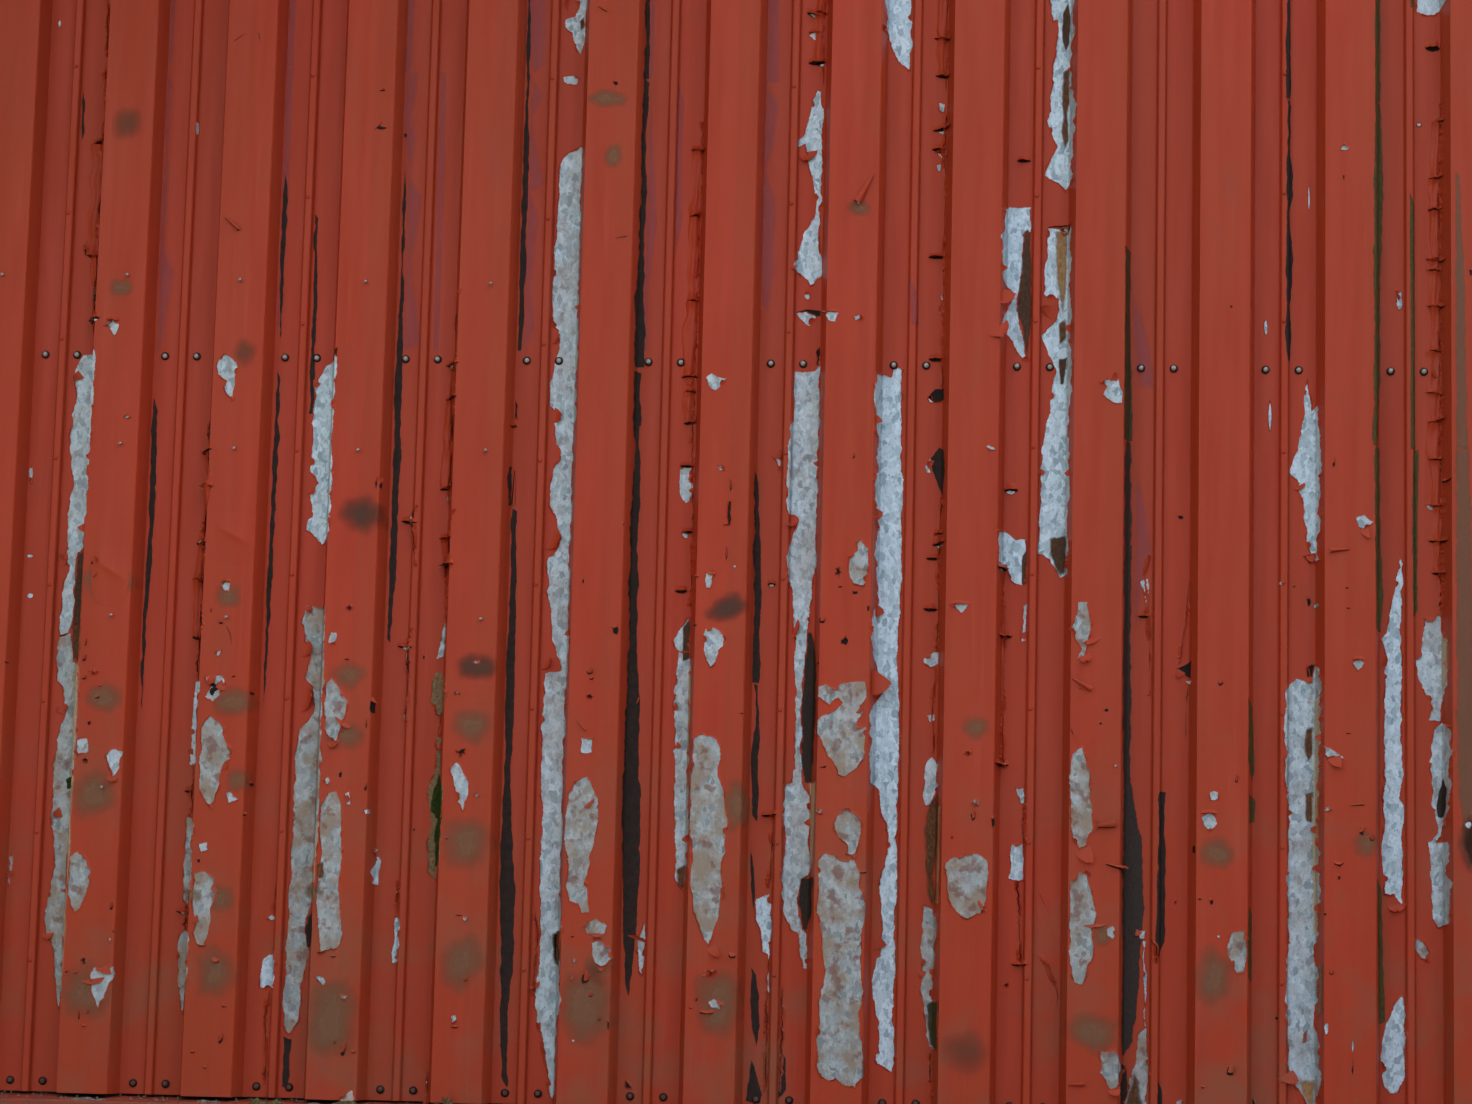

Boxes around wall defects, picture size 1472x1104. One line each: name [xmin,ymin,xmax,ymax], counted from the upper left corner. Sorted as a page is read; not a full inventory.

peeling [41,348,127,1027]
peeling [258,604,378,1035]
peeling [305,353,340,546]
peeling [527,144,614,1101]
peeling [671,616,736,978]
peeling [791,89,864,327]
peeling [753,355,905,1089]
peeling [989,204,1075,642]
peeling [1017,0,1079,193]
peeling [1068,745,1128,986]
peeling [1288,380,1350,563]
peeling [1275,554,1471,1104]